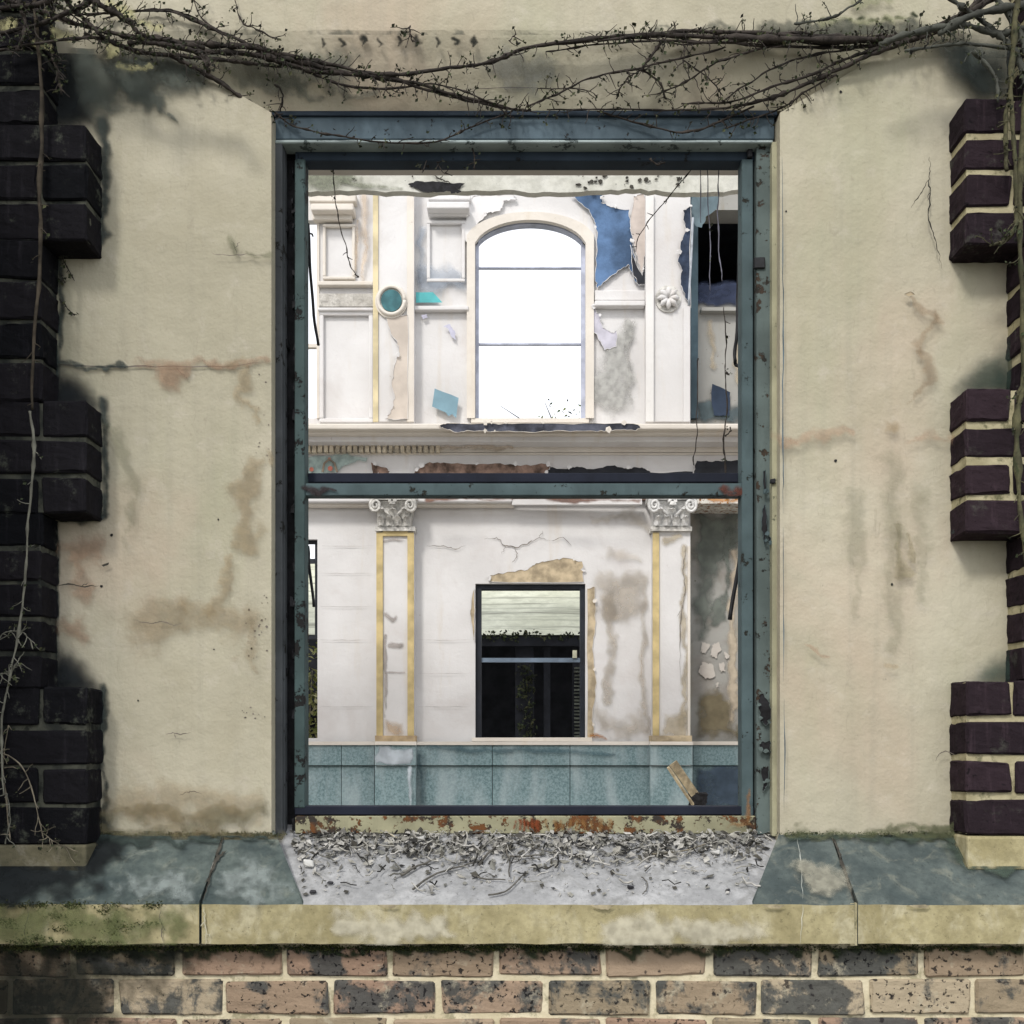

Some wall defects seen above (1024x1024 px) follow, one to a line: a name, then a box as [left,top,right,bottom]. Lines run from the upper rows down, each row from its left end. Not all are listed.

flaking render [575,175,659,289]
crack [911,163,942,268]
crack [57,362,264,378]
flaking render [385,315,409,420]
leakage [594,319,635,410]
flaking render [414,459,738,473]
crack [488,533,572,561]
flaking render [487,557,597,737]
flaking render [698,642,729,689]
leakage [100,684,283,842]
rust [513,818,612,832]
crack [201,837,227,939]